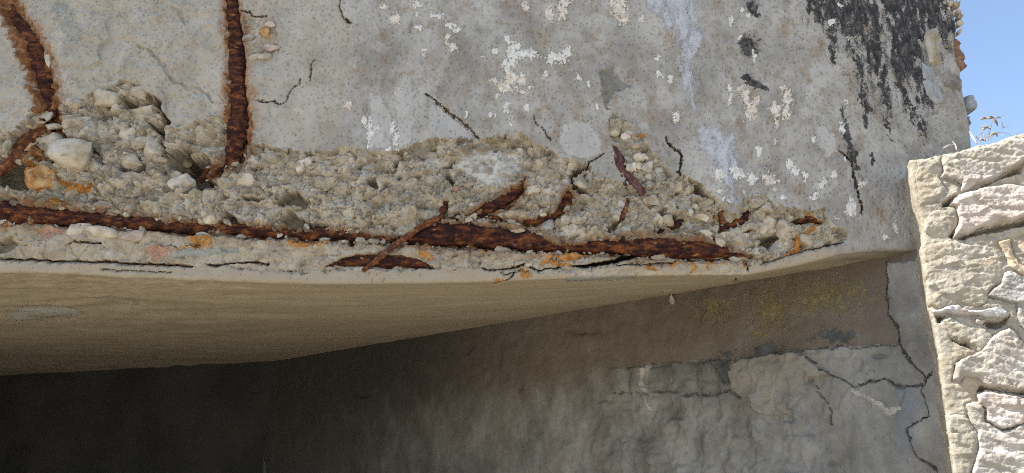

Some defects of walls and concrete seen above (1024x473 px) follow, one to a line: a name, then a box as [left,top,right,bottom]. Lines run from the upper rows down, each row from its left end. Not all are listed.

damp [379,1,461,52]
damp [543,0,577,25]
crack [257,60,316,105]
damp [480,34,576,126]
rust [0,0,751,279]
damp [361,113,400,151]
spalling [0,62,849,278]
crack [425,93,480,139]
crack [665,136,683,176]
damp [712,0,956,220]
crack [5,240,270,273]
crack [613,261,938,472]